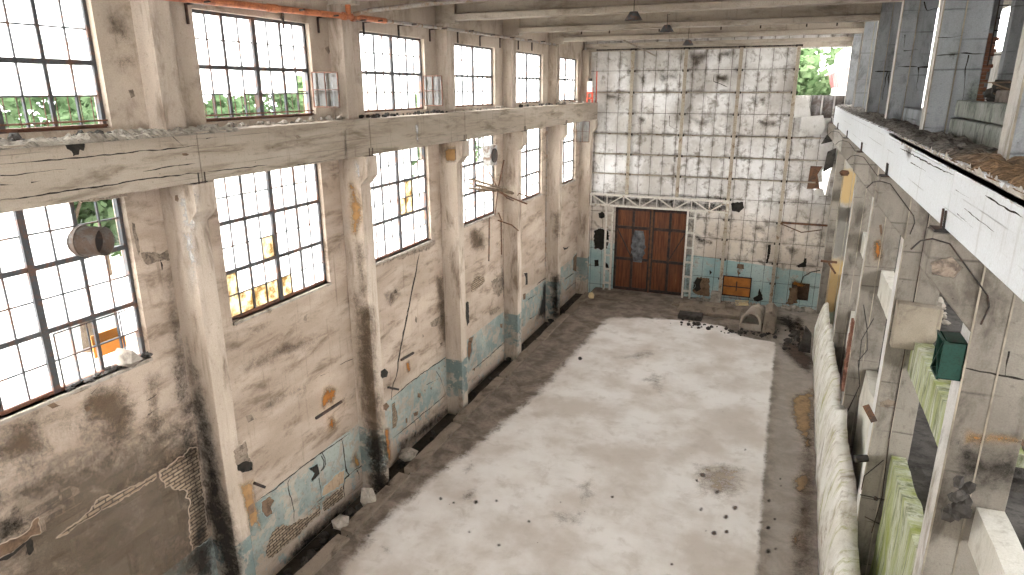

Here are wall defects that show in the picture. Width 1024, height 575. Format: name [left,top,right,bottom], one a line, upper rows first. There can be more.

corrosion [349,183,362,233]
crack [900,148,1021,232]
water stain [437,277,446,344]
water stain [358,308,382,440]
water stain [2,422,42,458]
water stain [89,389,132,439]
spalling [232,440,253,474]
flaking render [0,516,42,561]
flaking render [56,446,209,551]
water stain [184,431,211,575]
flaking render [248,463,345,560]